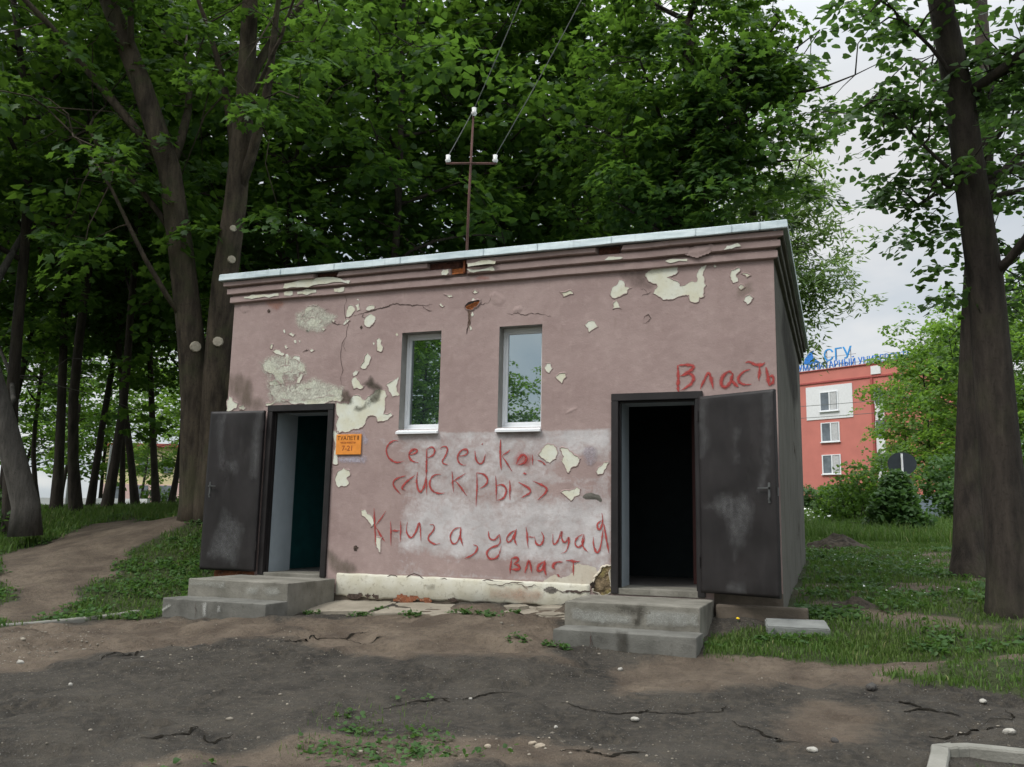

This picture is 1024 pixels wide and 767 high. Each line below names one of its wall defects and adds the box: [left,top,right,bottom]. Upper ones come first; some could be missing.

peeling [441,260,496,275]
peeling [644,259,716,304]
peeling [729,267,754,305]
crack [312,300,430,384]
peeling [244,277,400,488]
damp [343,379,380,409]
peeling [538,443,581,474]
peeling [595,461,609,476]
peeling [560,486,581,502]
peeling [360,509,383,553]
peeling [543,564,611,595]